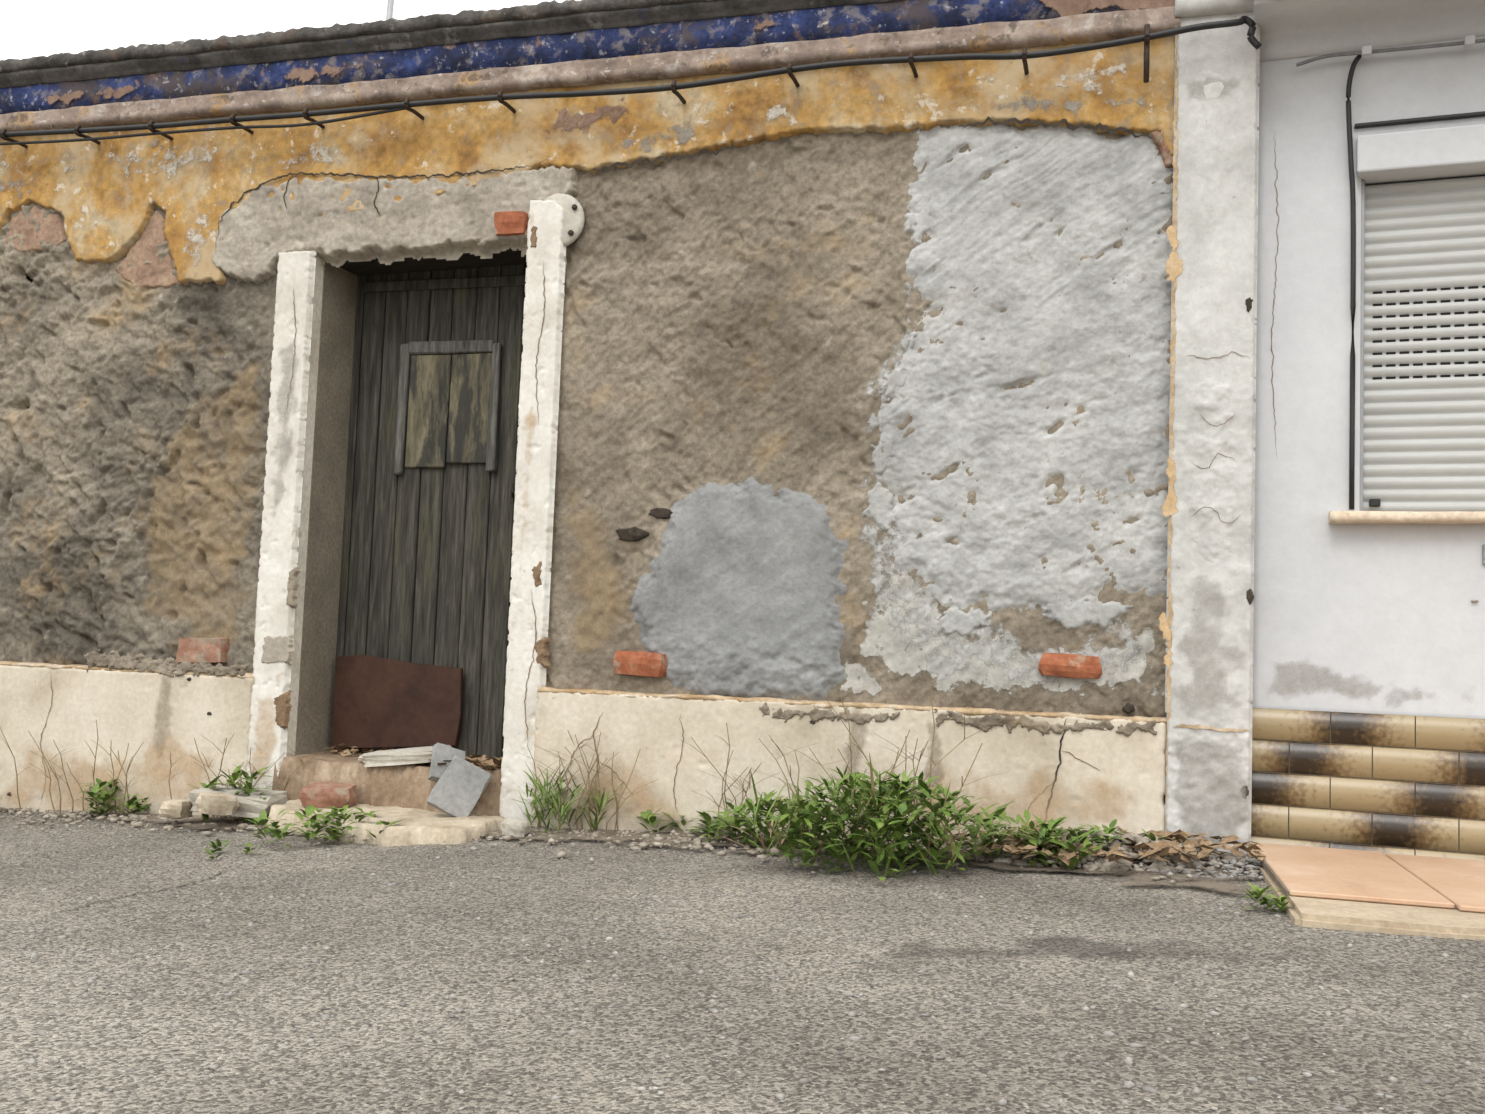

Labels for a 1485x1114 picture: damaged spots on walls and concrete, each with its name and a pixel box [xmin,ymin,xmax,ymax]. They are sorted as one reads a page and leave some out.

peeling [45,84,134,105]
peeling [284,63,360,83]
peeling [766,104,787,121]
peeling [983,63,1146,180]
peeling [106,138,229,179]
flaking render [1143,131,1173,249]
flaking render [494,211,538,248]
flaking render [0,161,295,681]
flaking render [532,124,1168,736]
crack [959,35,1279,831]
peeling [286,566,301,609]
peeling [274,690,292,730]